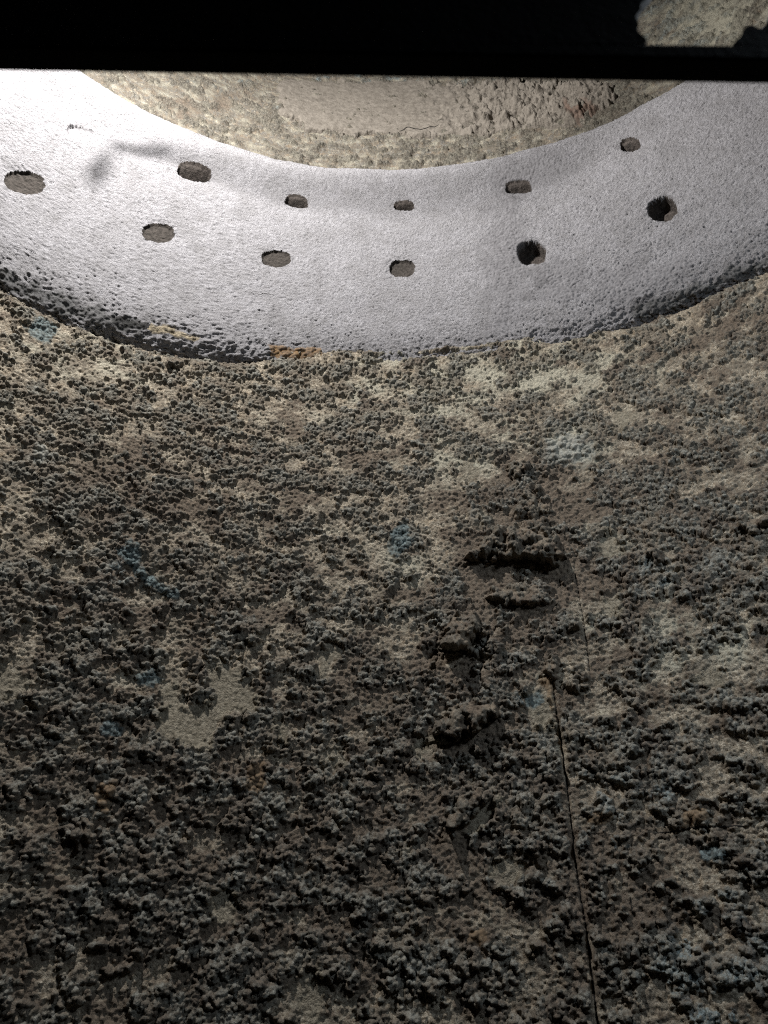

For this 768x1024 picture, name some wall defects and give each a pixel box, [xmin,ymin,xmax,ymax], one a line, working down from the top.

crack [458,683,598,1024]